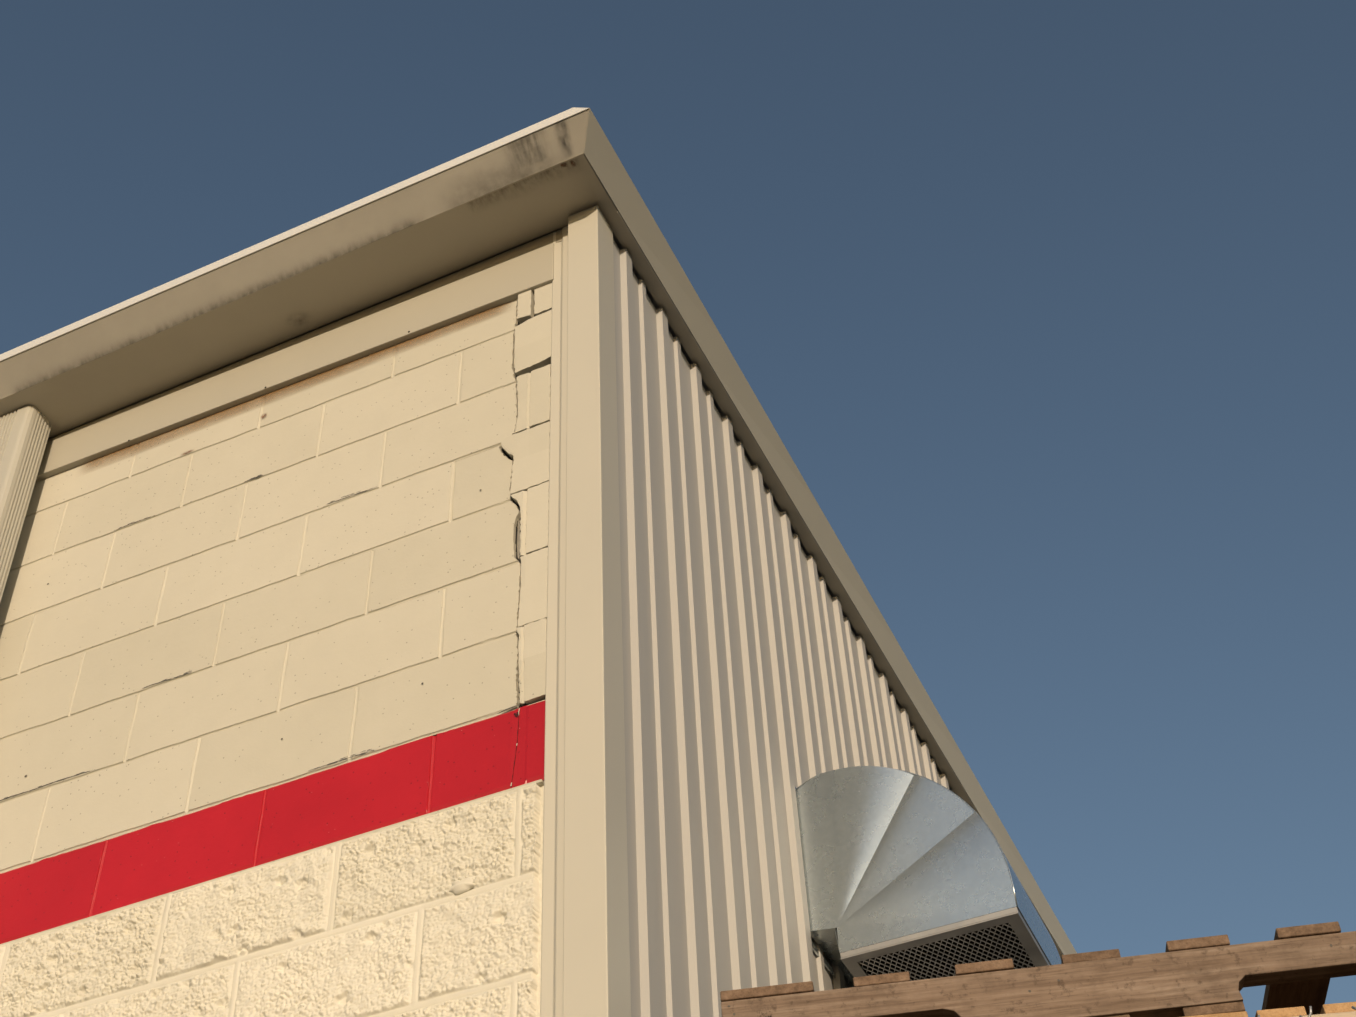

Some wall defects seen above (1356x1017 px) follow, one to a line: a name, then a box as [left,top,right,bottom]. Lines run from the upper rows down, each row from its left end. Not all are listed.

crack [510,682,523,786]